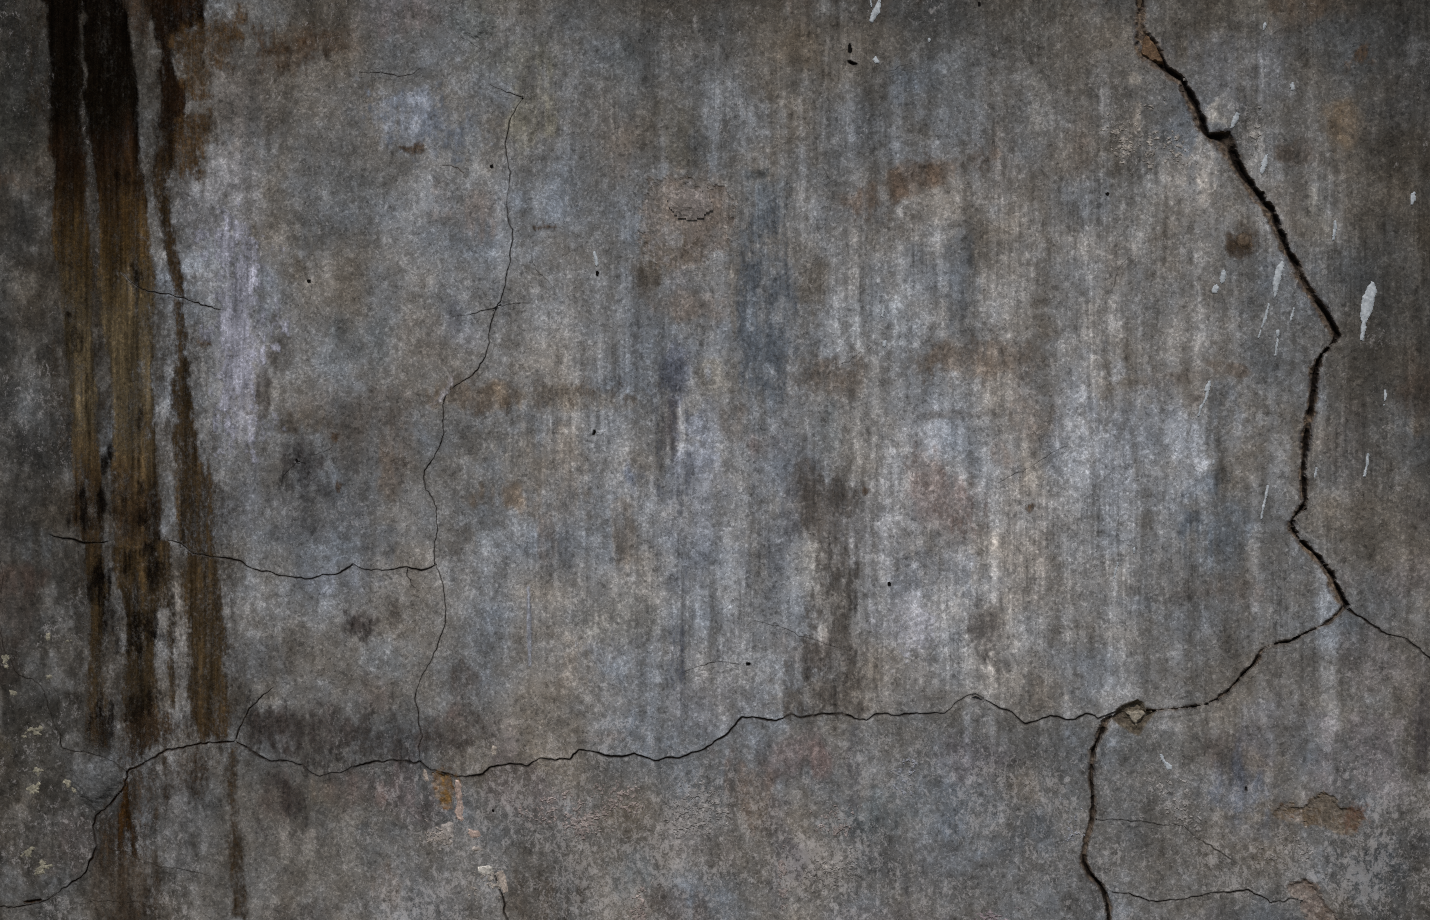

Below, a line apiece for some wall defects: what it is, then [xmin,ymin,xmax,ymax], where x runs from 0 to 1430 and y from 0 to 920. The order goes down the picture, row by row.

crack [47,529,111,549]
crack [121,272,228,314]
leakage [31,0,374,920]
crack [166,79,532,761]
crack [995,441,1072,488]
crack [1126,7,1430,719]
crack [0,559,1301,920]